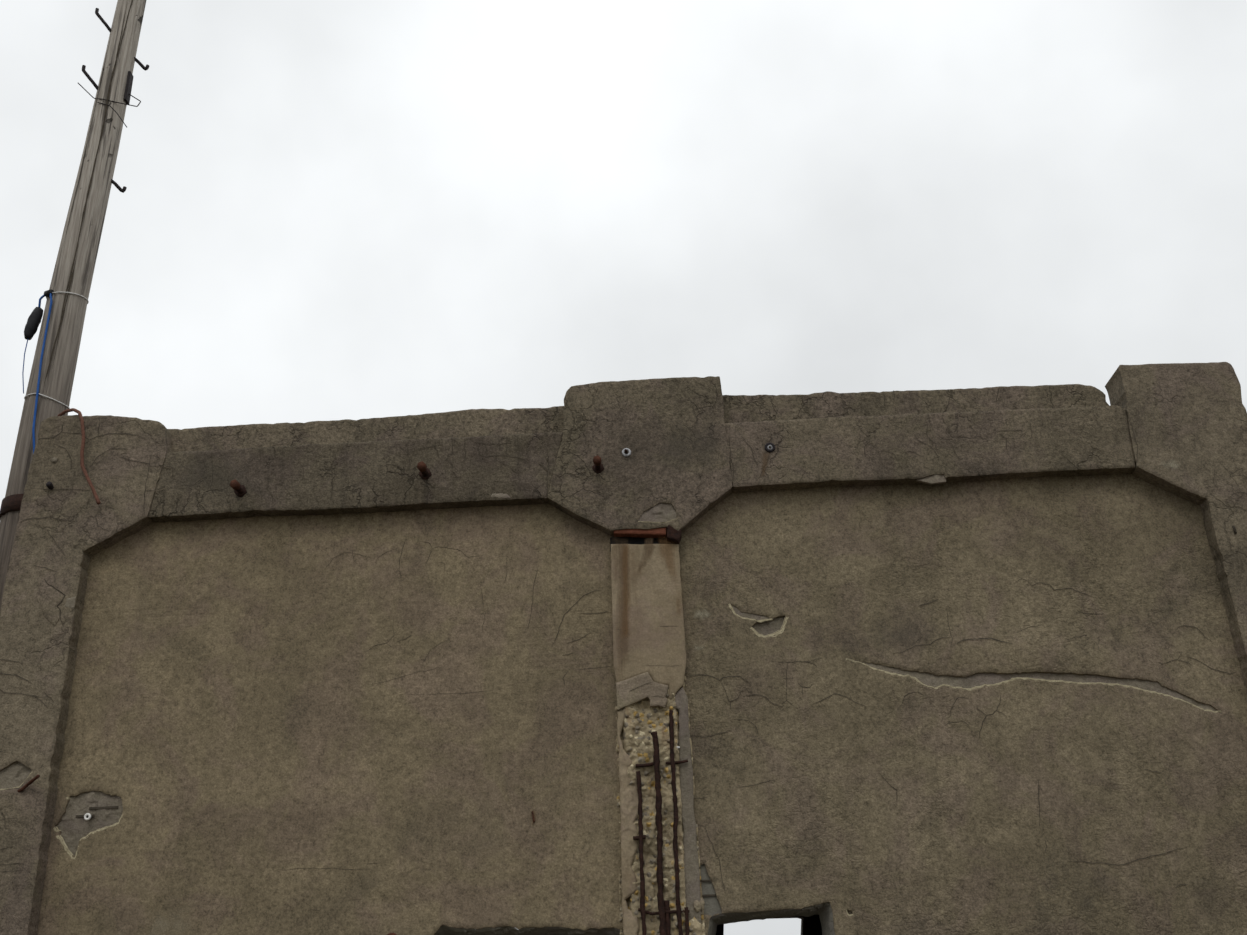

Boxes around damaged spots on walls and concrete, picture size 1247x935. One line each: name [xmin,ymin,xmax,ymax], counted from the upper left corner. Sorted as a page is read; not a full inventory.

crack [330,540,619,695]
spalling [728,604,789,638]
crack [1015,578,1128,640]
crack [629,599,1237,739]
spalling [53,791,123,859]
spalling [685,864,724,935]